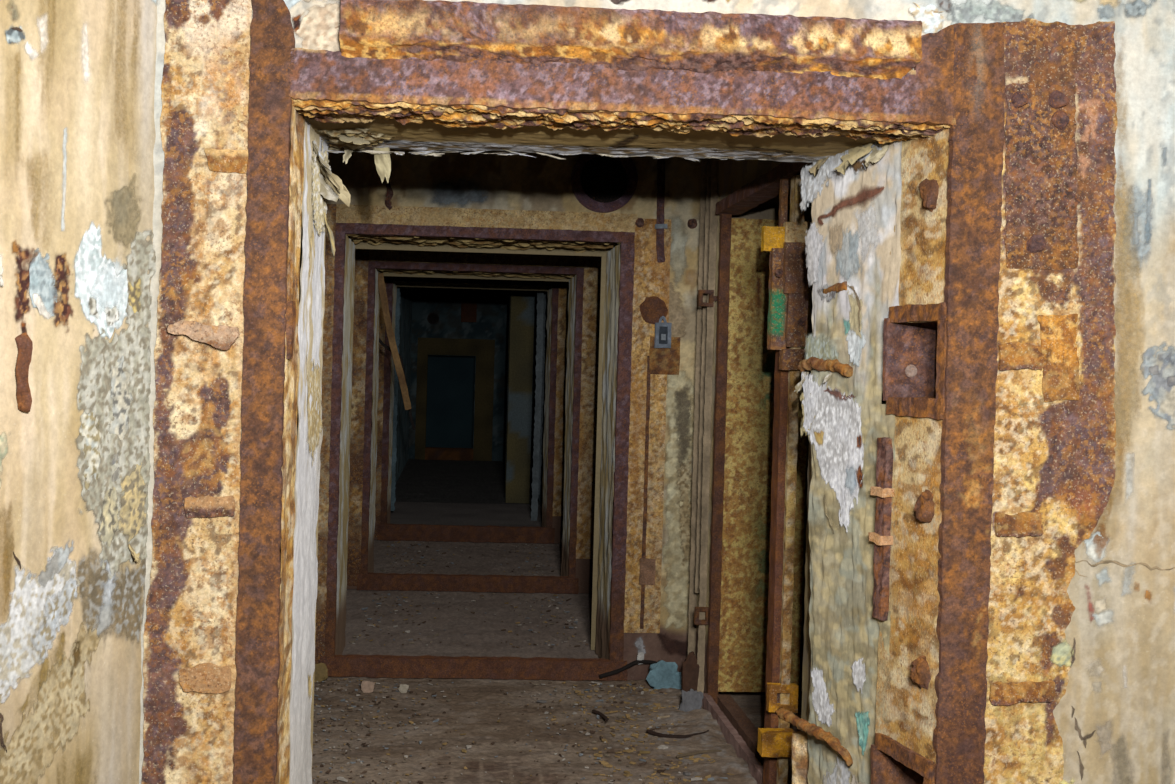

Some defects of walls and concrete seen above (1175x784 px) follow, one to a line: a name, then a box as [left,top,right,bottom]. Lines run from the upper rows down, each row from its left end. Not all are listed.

leakage [37,0,55,54]
leakage [82,24,90,81]
leakage [109,176,140,246]
peeling [309,128,890,276]
spalling [29,249,57,319]
peeling [75,222,156,579]
spalling [306,357,323,466]
peeling [793,206,879,533]
spalling [1140,343,1175,430]
leakage [3,512,14,609]
leakage [21,633,65,711]
peeling [0,540,100,784]